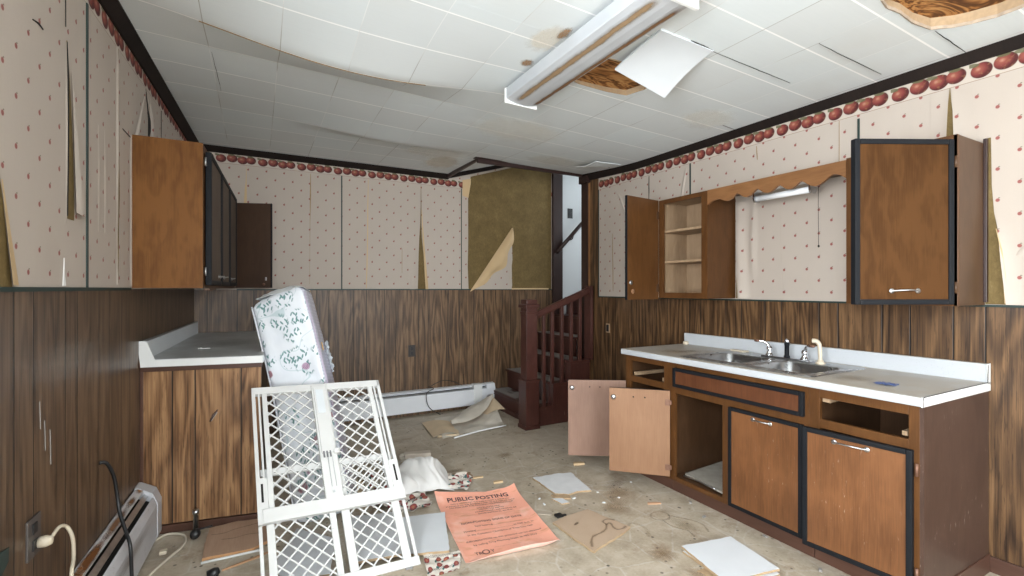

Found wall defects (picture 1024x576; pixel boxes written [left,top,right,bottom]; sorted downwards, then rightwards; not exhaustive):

spalling [884,0,1024,26]